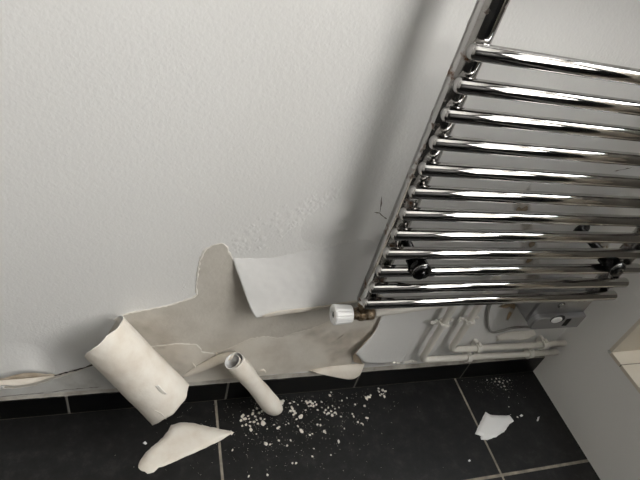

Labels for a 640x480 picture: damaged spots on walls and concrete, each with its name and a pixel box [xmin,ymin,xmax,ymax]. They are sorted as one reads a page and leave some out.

crack [1,364,97,397]
peeling [0,239,421,425]